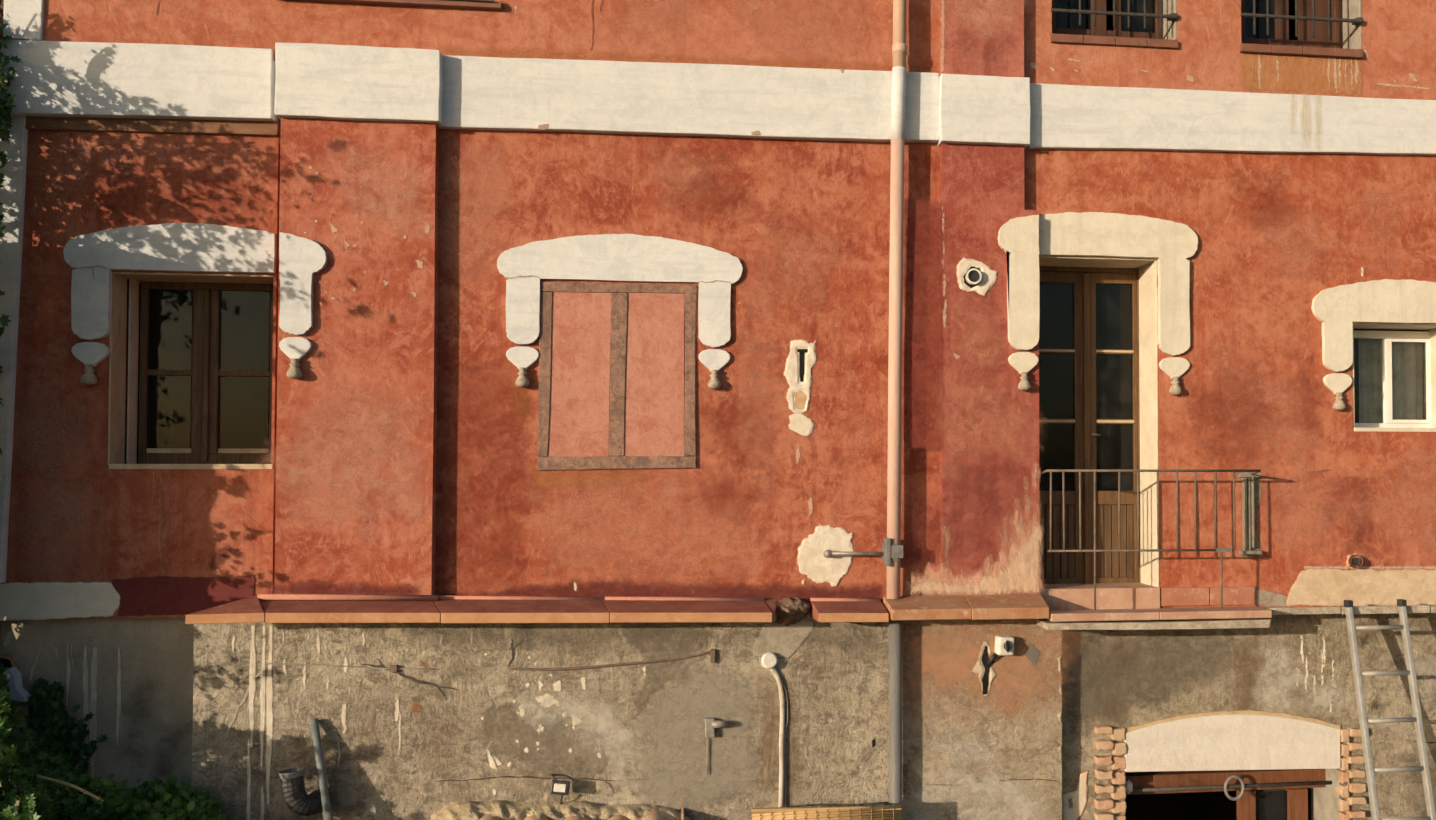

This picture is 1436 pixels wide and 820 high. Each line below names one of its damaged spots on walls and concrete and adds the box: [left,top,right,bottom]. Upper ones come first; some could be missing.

crack [591,0,603,50]
corrosion [1243,53,1362,96]
spalling [783,339,817,464]
leakage [111,541,415,616]
spalling [769,498,854,626]
peeling [906,464,1043,596]
leakage [29,639,97,785]
leakage [232,625,320,820]
leakage [338,704,347,761]
crack [362,658,458,700]
hole [971,641,997,697]